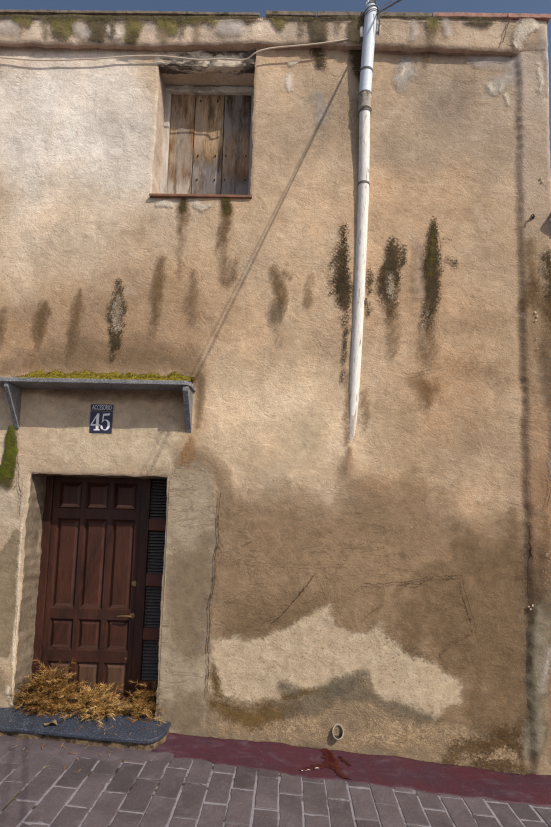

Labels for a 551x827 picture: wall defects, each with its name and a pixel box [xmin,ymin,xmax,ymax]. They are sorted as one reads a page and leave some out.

damp [0,14,364,83]
damp [178,198,190,230]
damp [47,278,168,364]
damp [150,256,165,323]
damp [270,267,292,330]
damp [327,223,354,381]
damp [364,235,407,354]
mould [419,216,458,357]
flaking render [5,480,25,705]
damp [155,451,540,773]
crack [359,575,479,654]
flaking render [206,604,525,775]